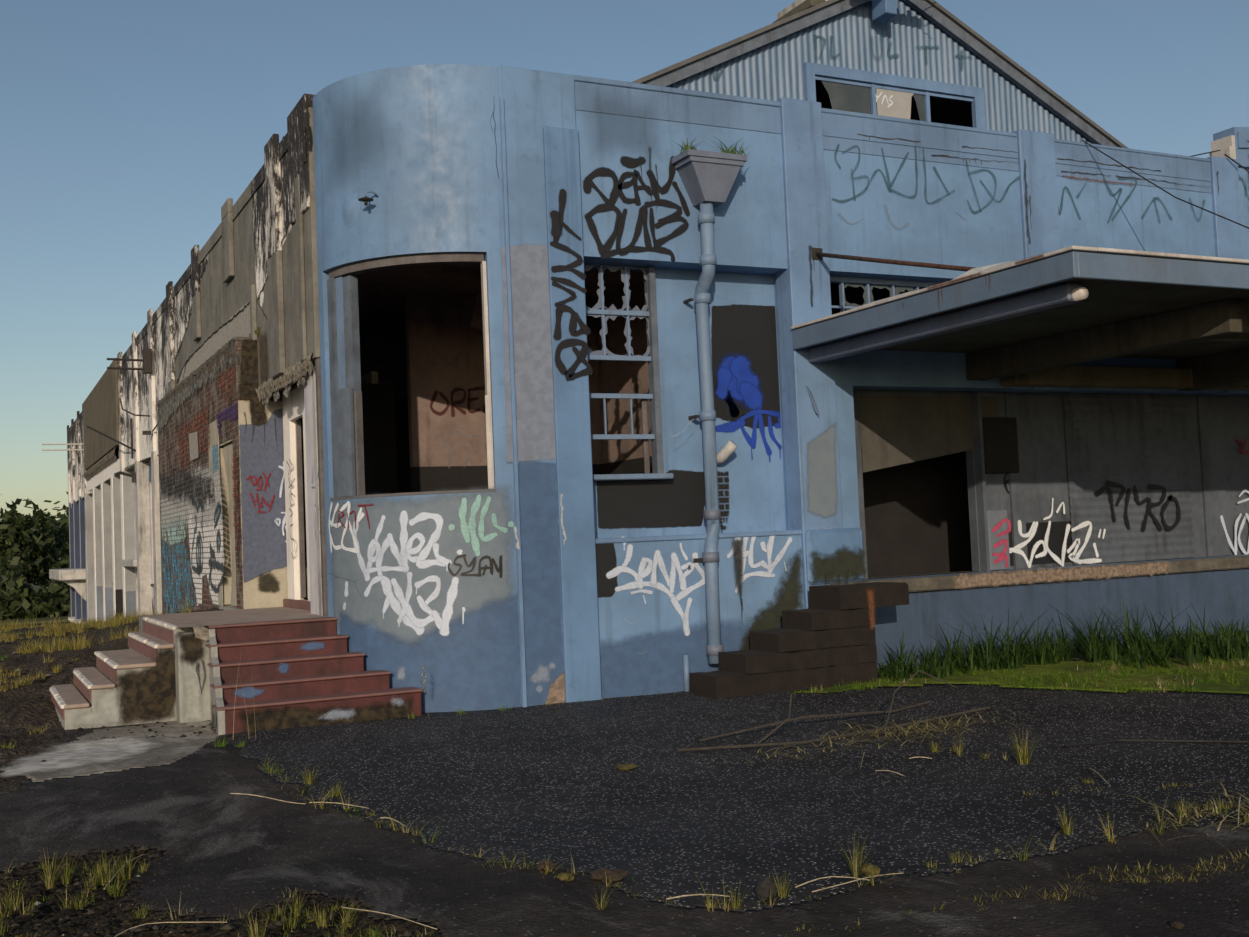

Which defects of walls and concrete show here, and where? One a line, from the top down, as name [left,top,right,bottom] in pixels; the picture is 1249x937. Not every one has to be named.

peeling [280,136,292,246]
flaking render [69,181,268,508]
spalling [256,353,314,404]
flaking render [232,451,240,550]